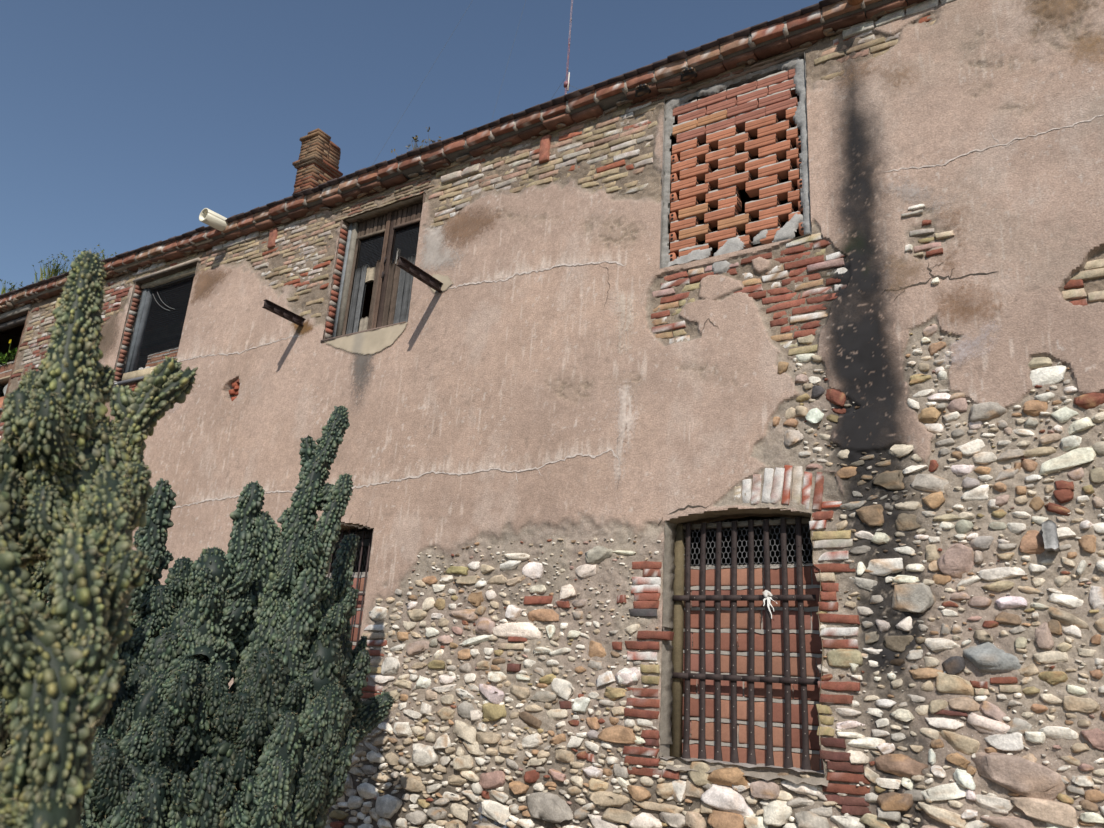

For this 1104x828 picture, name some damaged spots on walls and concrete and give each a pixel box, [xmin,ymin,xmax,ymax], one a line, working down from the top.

flaking render [101,0,941,329]
crack [886,115,1103,172]
flaking render [901,204,955,261]
crack [885,263,998,299]
flaking render [8,295,62,393]
flaking render [221,376,240,402]
crack [351,426,628,490]
crack [173,490,296,508]
flaking render [325,219,1104,828]